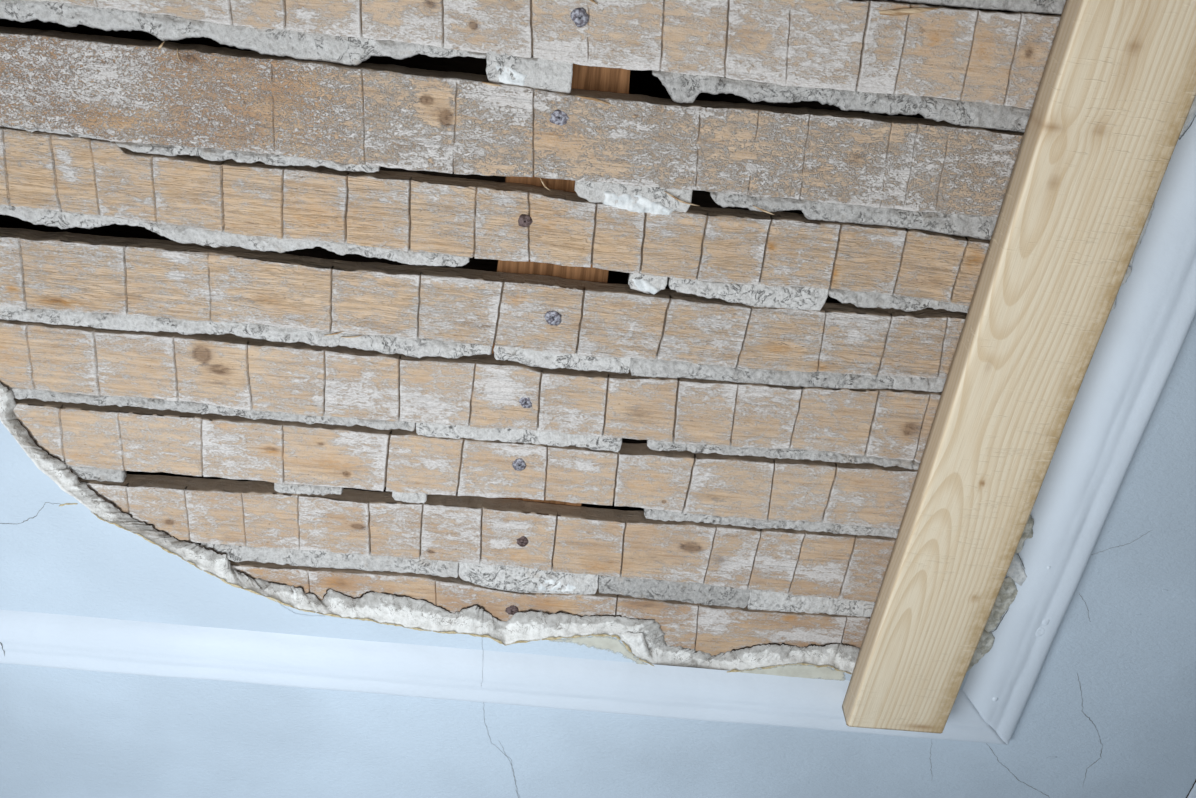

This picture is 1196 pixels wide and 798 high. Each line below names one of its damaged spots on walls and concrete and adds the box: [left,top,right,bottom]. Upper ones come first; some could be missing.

crack [17,419,655,621]
flaking render [0,383,860,681]
crack [714,643,856,656]
flaking render [967,515,1034,671]